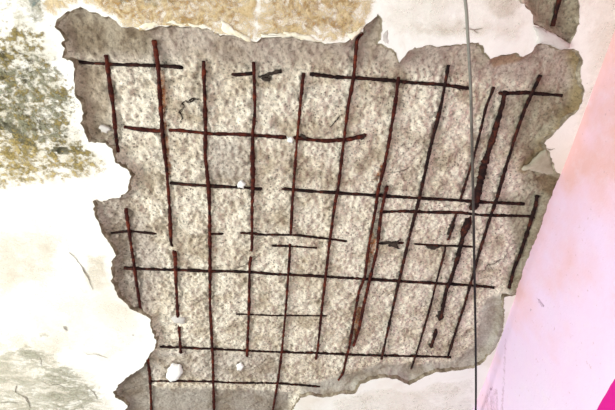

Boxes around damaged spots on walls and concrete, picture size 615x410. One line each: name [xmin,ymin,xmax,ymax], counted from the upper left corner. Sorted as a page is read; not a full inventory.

leakage [0,12,102,189]
spalling [54,7,475,410]
rust [258,69,282,82]
rust [368,233,401,267]
spalling [470,0,585,366]